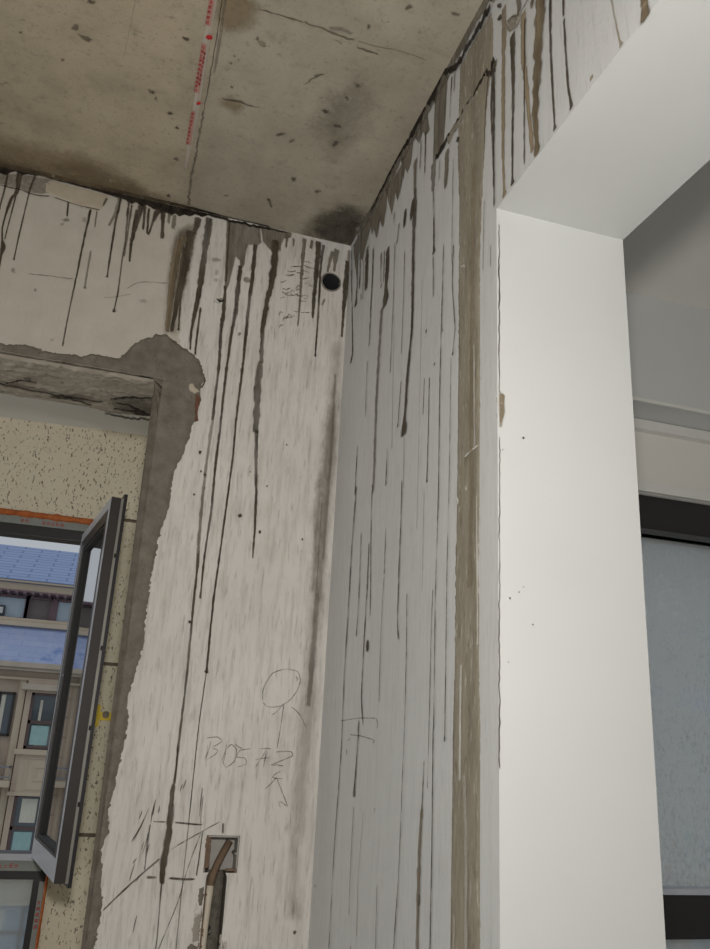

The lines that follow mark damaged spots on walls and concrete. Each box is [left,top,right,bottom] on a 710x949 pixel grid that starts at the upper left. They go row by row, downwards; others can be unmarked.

crack [0,0,287,233]
water stain [484,0,573,206]
water stain [640,0,650,23]
water stain [0,145,213,355]
water stain [155,73,455,949]